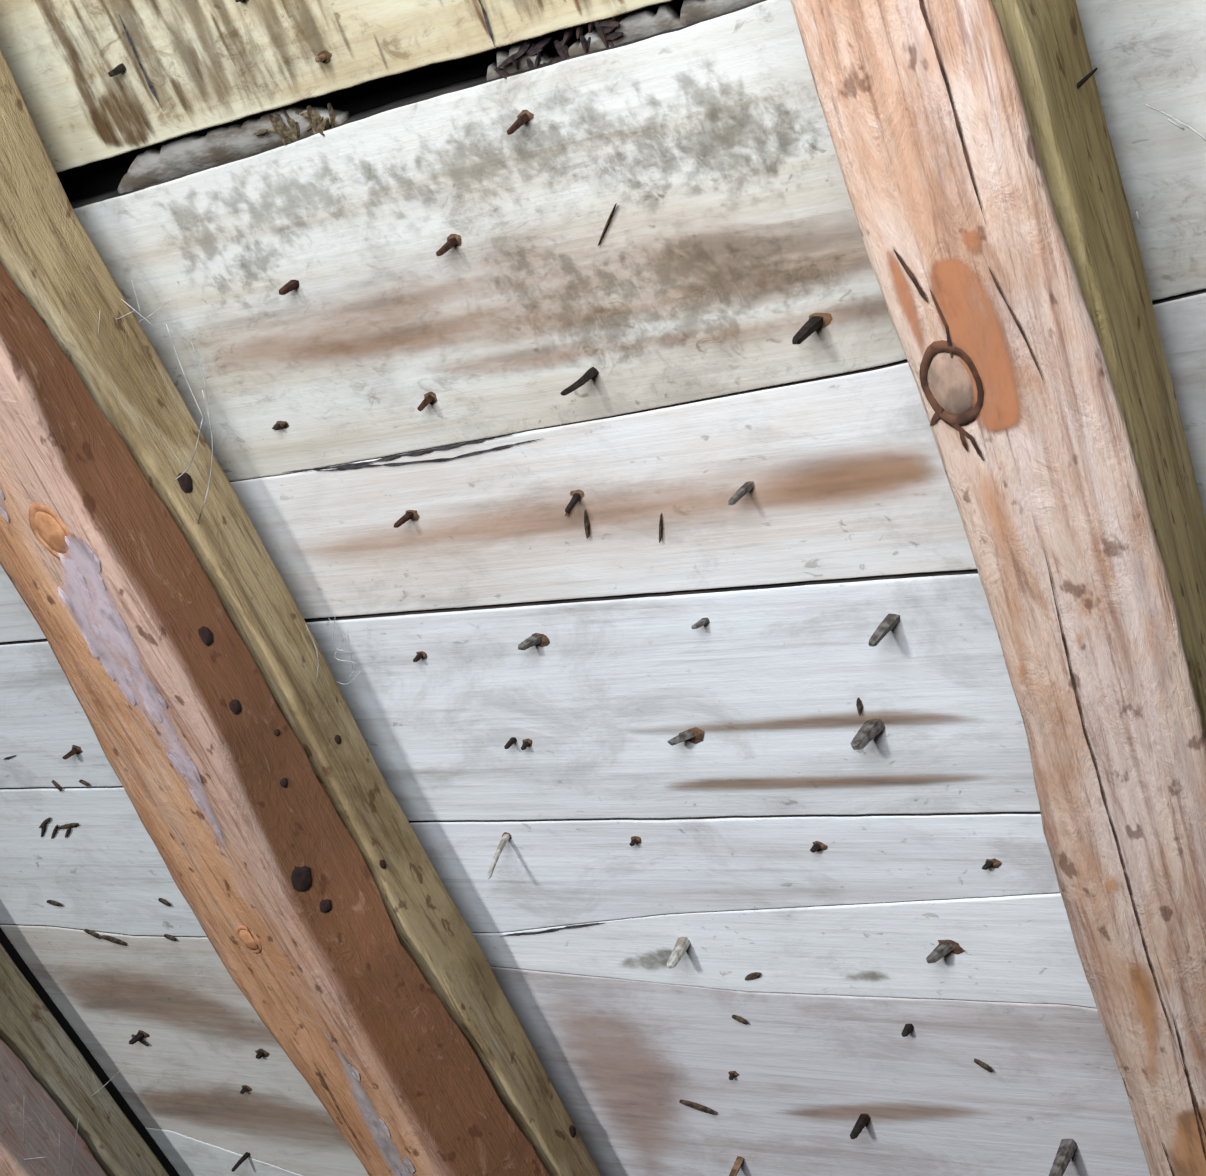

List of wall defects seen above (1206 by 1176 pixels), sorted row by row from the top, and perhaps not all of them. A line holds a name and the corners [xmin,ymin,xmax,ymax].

water stain [39,0,149,146]
water stain [172,79,186,108]
crack [919,0,986,224]
crack [894,250,953,359]
crack [988,266,1043,379]
crack [930,407,984,461]
crack [1044,550,1206,1160]